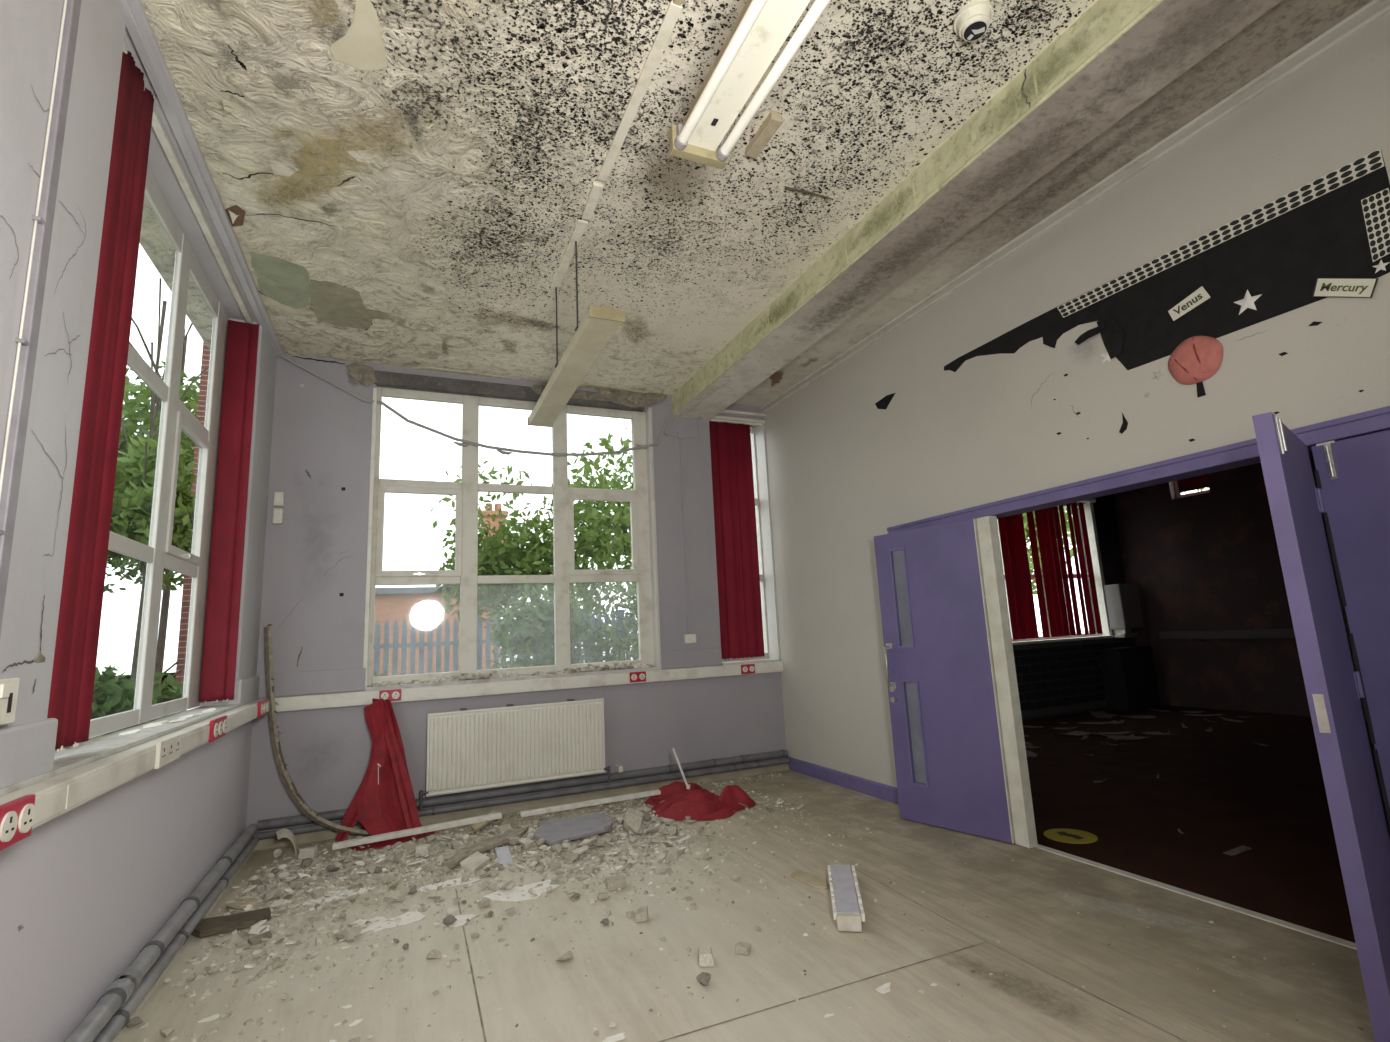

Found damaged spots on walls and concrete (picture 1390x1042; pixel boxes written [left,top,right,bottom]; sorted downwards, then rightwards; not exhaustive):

peeling [330,0,387,71]
peeling [269,137,304,177]
peeling [347,150,390,169]
water stain [269,0,1094,352]
crack [0,215,19,278]
crack [29,164,86,376]
peeling [250,252,395,329]
crack [32,426,67,557]
crack [2,595,45,693]